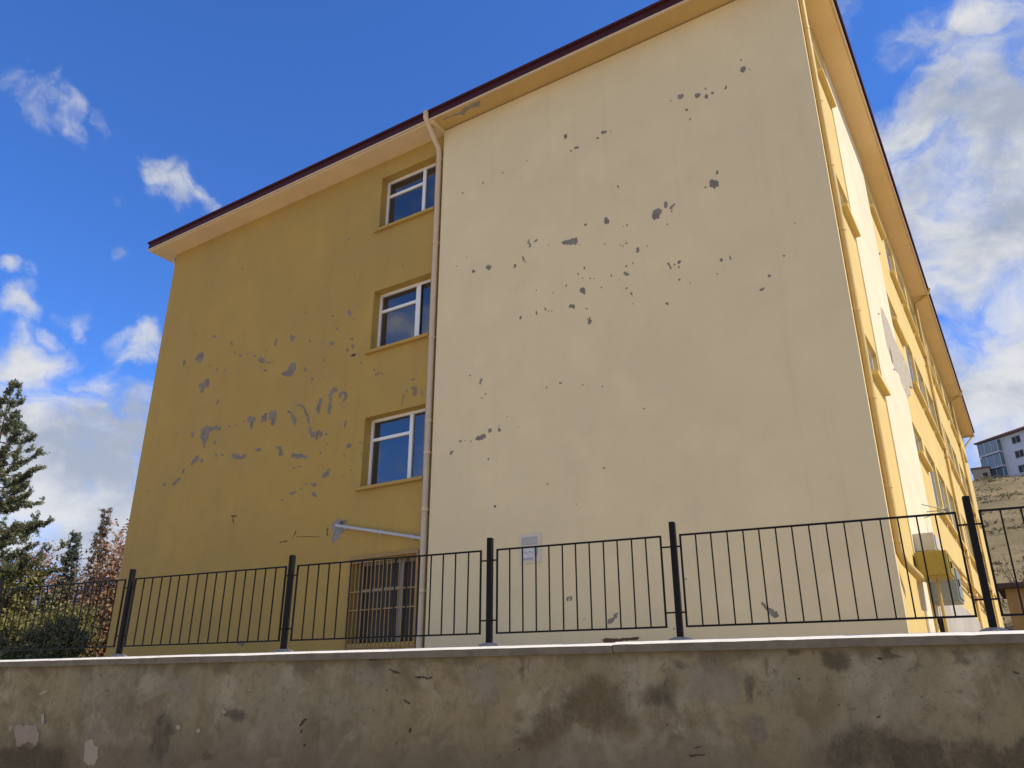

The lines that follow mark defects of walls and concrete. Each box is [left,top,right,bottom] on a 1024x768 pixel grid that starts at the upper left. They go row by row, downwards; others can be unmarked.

peeling [652,201,675,225]
peeling [514,237,580,268]
peeling [163,363,348,486]
spalling [84,739,98,766]